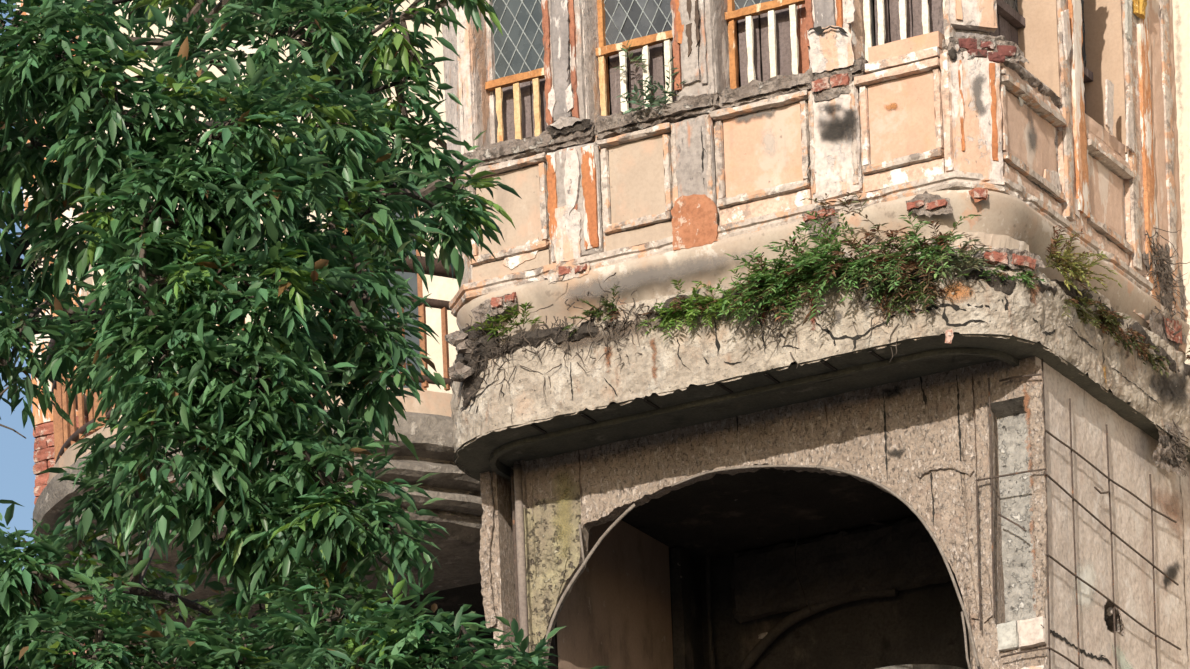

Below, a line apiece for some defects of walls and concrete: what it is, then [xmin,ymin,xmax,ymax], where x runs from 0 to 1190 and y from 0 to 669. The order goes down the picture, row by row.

peeling [546,0,591,137]
flaking render [947,35,1029,63]
leakage [819,104,858,140]
peeling [503,148,590,283]
peeling [671,194,718,251]
flaking render [981,247,1046,272]
spalling [445,292,518,409]
crack [676,313,799,370]
crack [816,274,1162,409]
leakage [1164,563,1179,587]
crack [1041,625,1113,667]